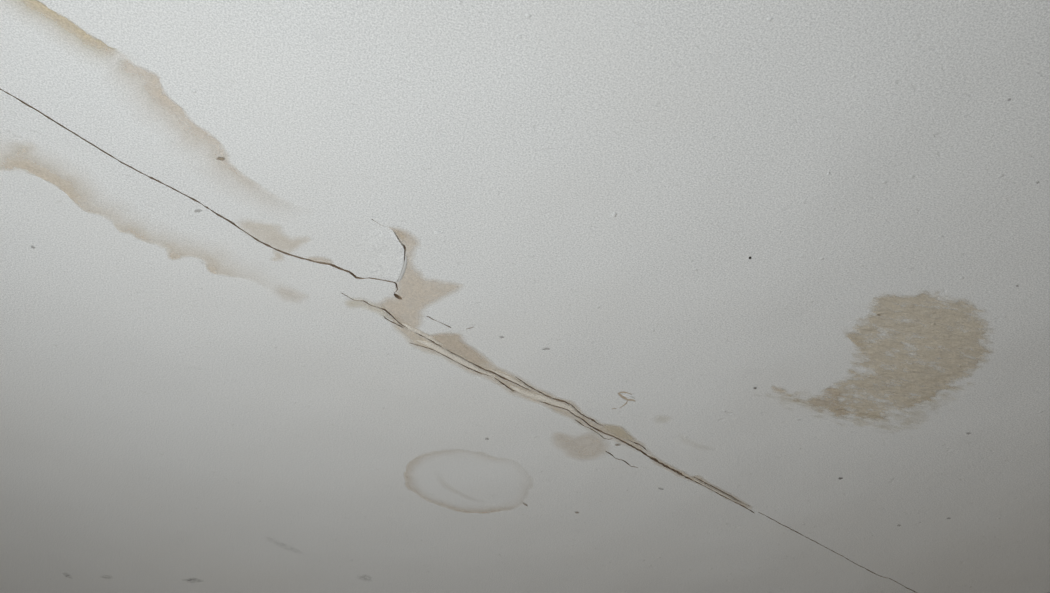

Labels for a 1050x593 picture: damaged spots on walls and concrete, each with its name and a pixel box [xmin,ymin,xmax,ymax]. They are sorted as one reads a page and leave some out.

leakage [24,0,107,47]
leakage [7,159,77,198]
crack [0,89,917,593]
leakage [384,268,562,411]
leakage [828,294,988,418]